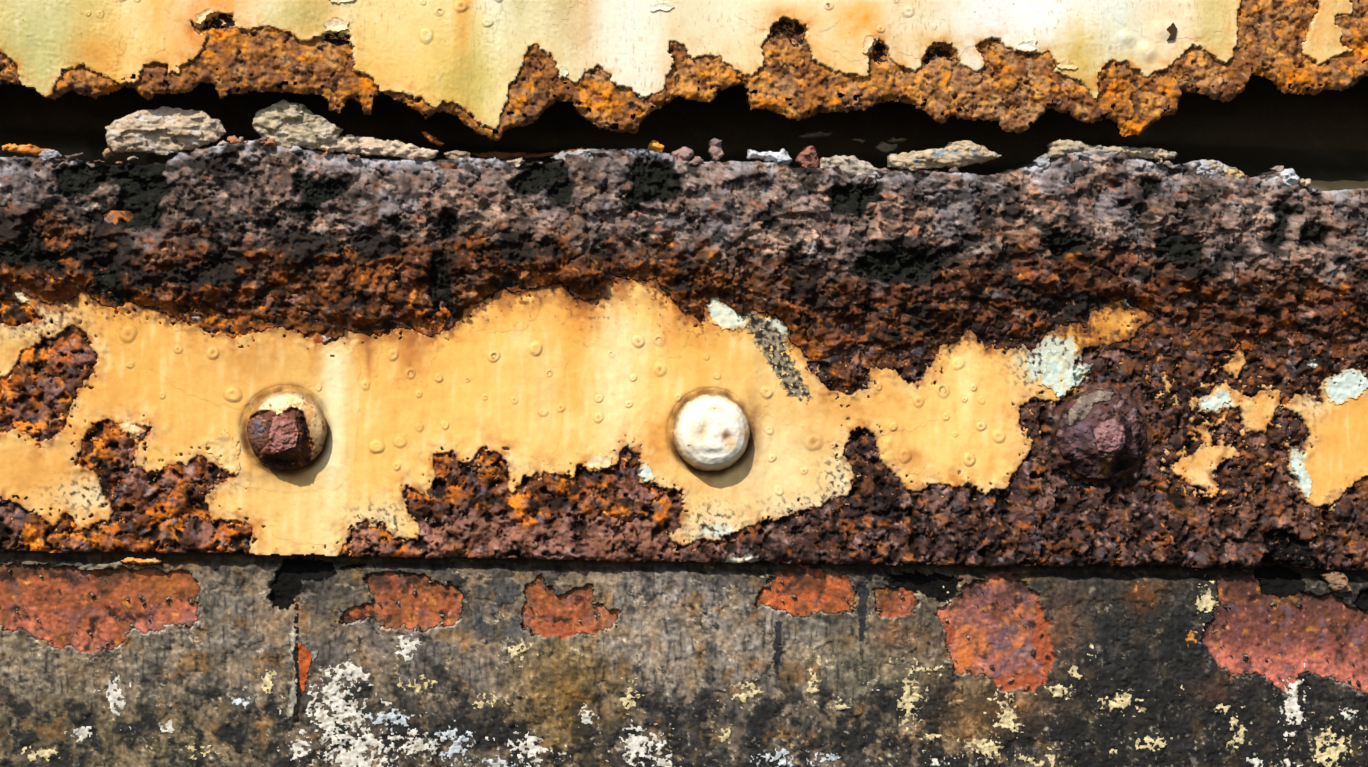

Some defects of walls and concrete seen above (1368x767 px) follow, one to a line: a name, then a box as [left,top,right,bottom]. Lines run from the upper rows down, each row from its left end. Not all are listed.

corrosion [49,0,1368,161]
corrosion [746,149,792,165]
corrosion [819,138,1001,177]
corrosion [0,290,298,570]
corrosion [150,282,616,409]
peeling [706,297,751,331]
peeling [1038,351,1093,400]
peeling [1304,355,1368,405]
corrosion [339,308,1368,767]
peeling [0,558,201,652]
peeling [933,570,1046,701]
peeling [1197,570,1368,730]